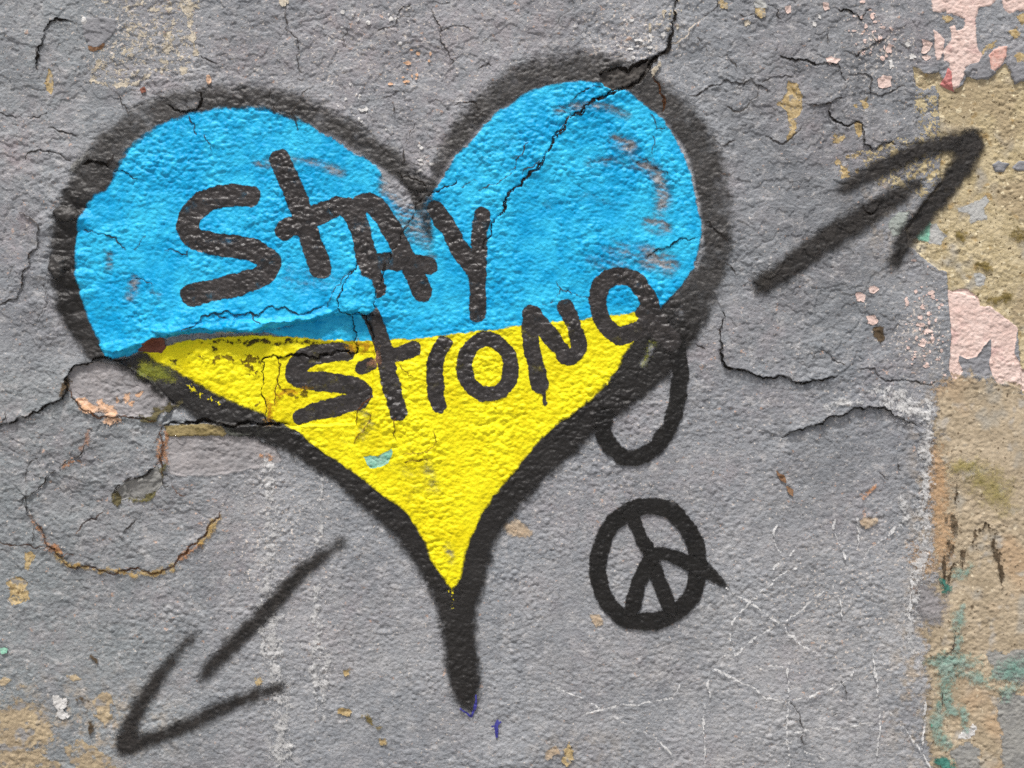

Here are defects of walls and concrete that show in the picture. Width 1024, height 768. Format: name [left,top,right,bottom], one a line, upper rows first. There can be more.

spalling [68,361,177,418]
crack [0,0,935,575]
peeling [833,0,1024,768]